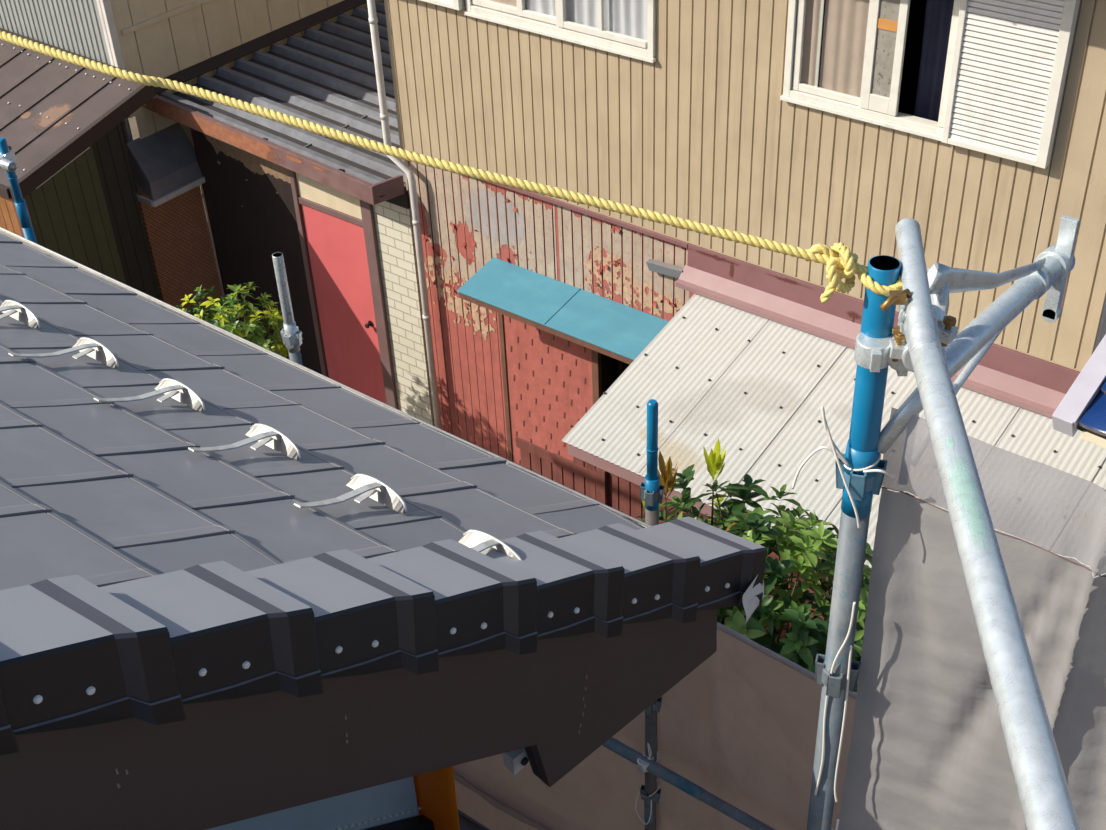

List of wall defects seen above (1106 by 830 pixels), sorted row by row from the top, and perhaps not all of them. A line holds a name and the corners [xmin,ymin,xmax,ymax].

flaking render [203,133,291,194]
peeling [407,161,690,340]